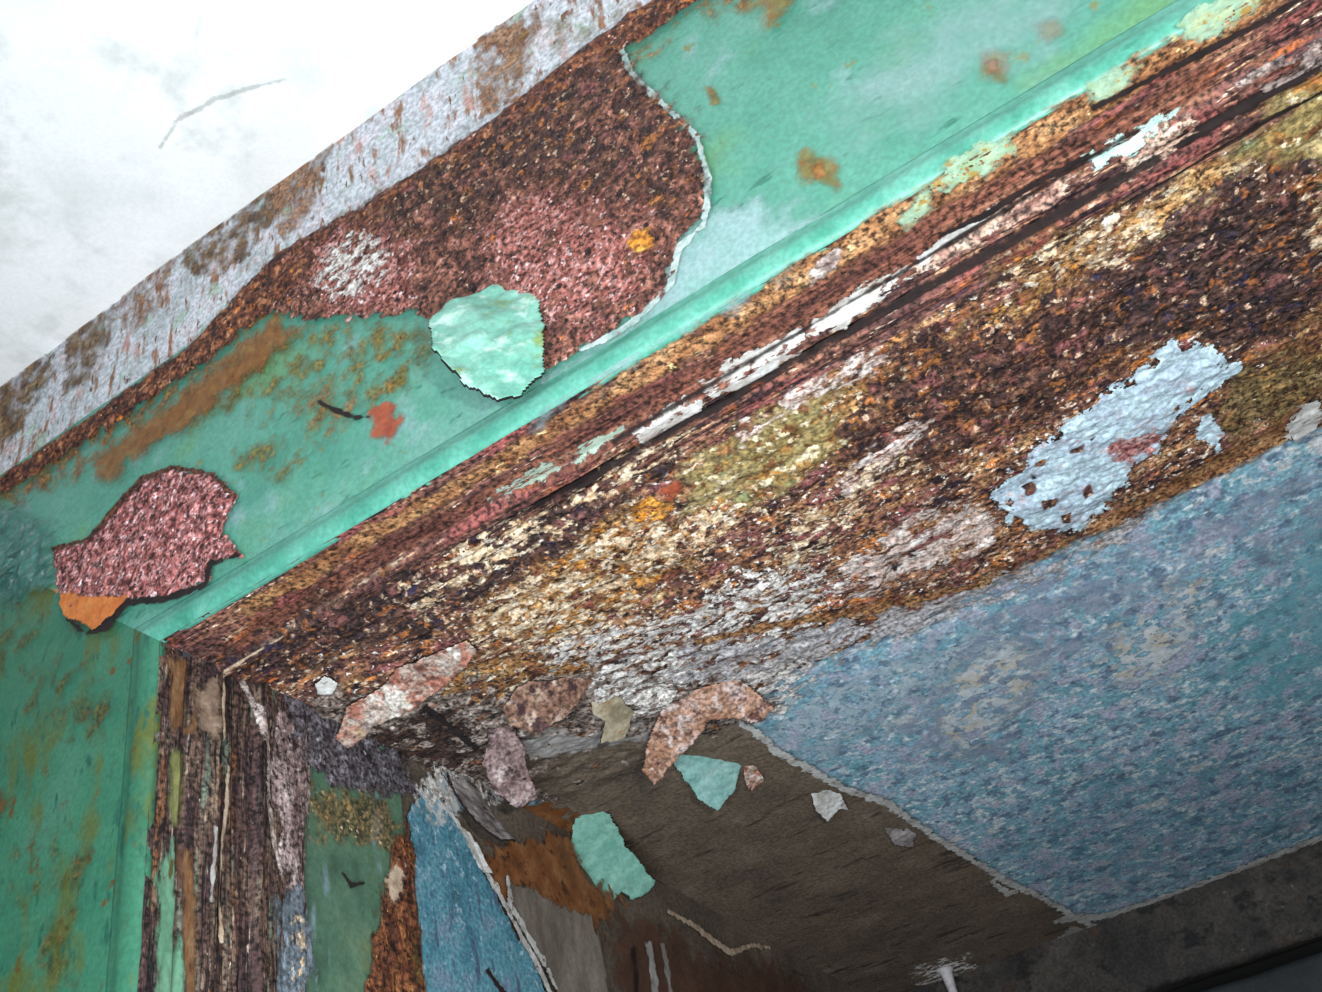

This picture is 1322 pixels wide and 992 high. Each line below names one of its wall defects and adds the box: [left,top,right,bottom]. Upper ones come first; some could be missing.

rust [0,143,427,504]
peeling [253,48,712,402]
rust [169,0,1322,739]
crack [506,61,1322,521]
crack [1092,0,1300,110]
peeling [51,465,244,635]
peeling [222,107,1322,992]
rust [177,850,196,992]
peeling [210,766,230,943]
rust [364,821,426,992]